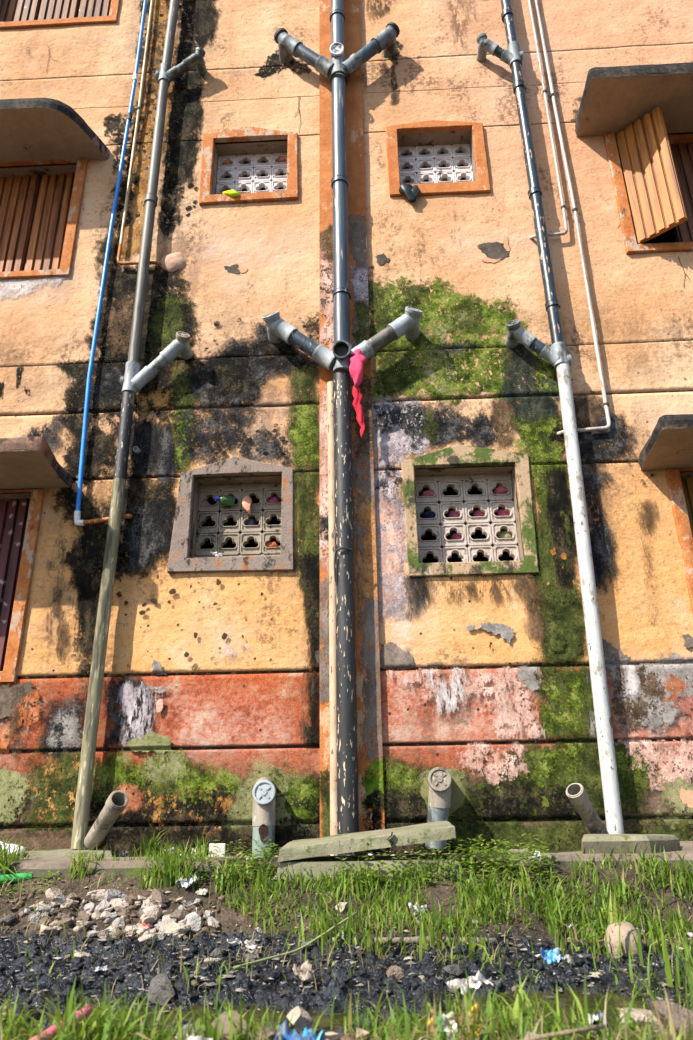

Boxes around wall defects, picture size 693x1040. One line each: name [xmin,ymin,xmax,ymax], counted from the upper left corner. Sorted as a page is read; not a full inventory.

water stain [157,0,220,238]
water stain [252,50,311,80]
spalling [224,264,248,274]
spalling [477,236,510,263]
water stain [0,97,320,764]
peeling [351,375,546,785]
water stain [372,342,580,651]
water stain [574,391,637,592]
spalling [0,681,42,826]
spalling [142,660,171,713]
water stain [85,784,253,857]
peeling [602,633,693,830]